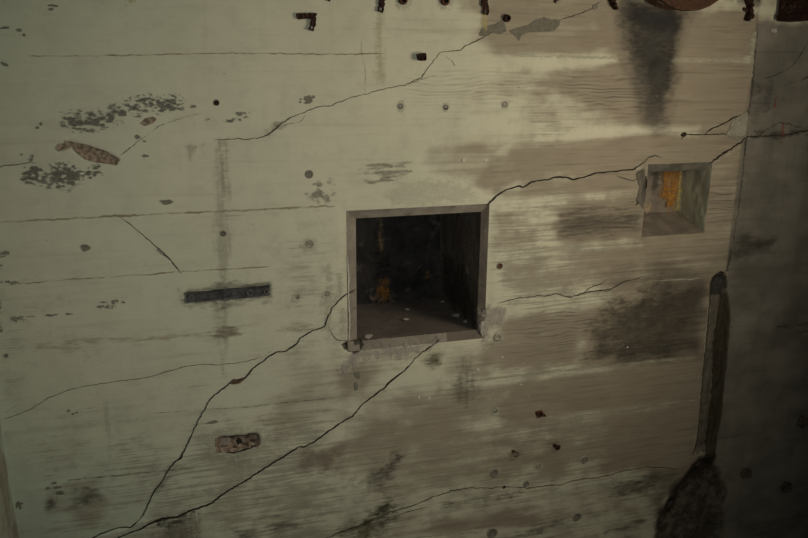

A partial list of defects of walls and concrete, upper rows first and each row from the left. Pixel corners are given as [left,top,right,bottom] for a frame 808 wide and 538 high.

crack [562,2,600,20]
leakage [629,3,680,94]
crack [215,32,493,140]
peeling [60,94,196,132]
crack [681,115,808,163]
peeling [20,140,120,189]
crack [487,155,660,205]
crack [500,276,646,303]
crack [4,288,440,538]
spalling [206,420,263,465]
crack [326,466,675,538]